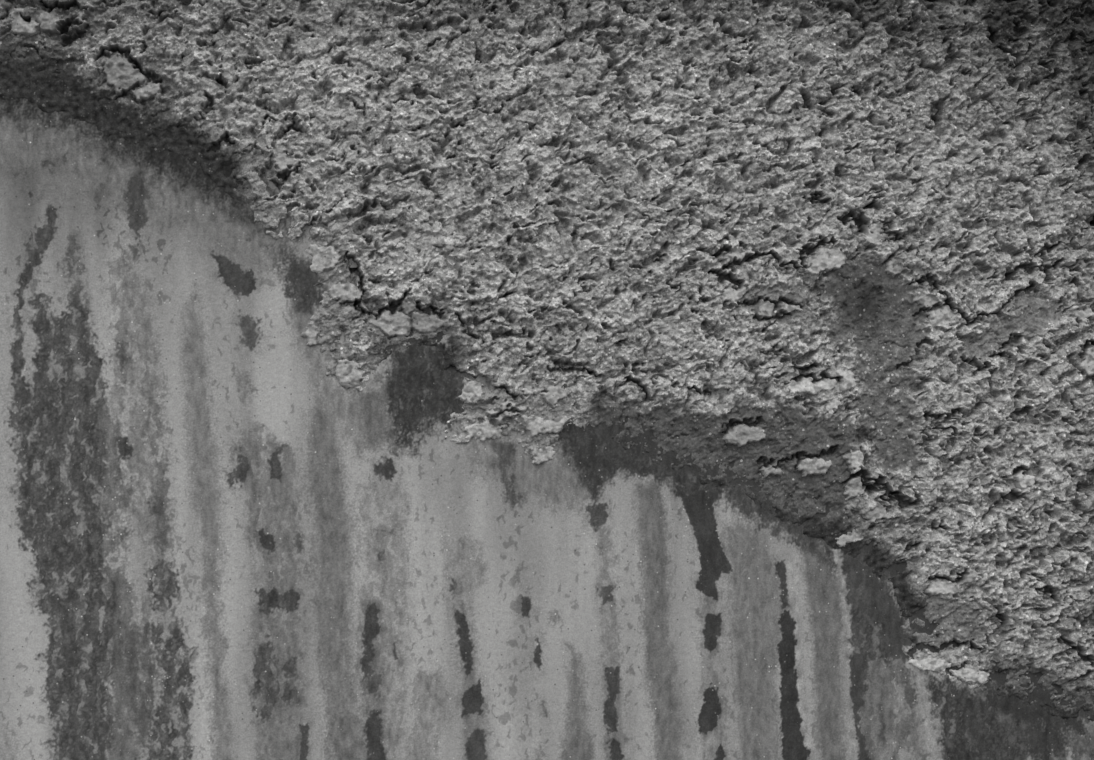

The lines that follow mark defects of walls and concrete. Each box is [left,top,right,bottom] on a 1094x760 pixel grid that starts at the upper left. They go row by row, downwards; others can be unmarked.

water stain [0,98,497,760]
water stain [450,410,1094,760]